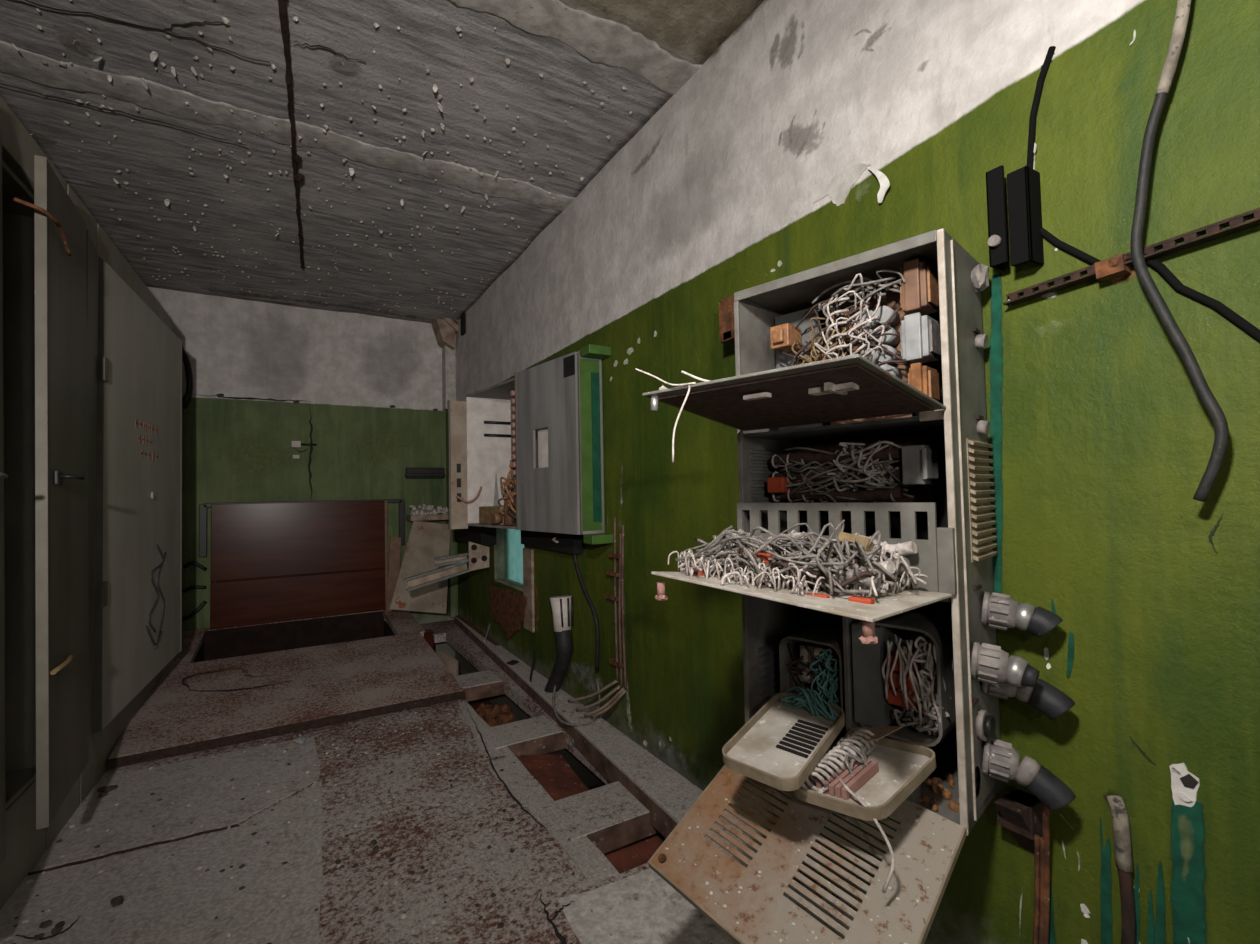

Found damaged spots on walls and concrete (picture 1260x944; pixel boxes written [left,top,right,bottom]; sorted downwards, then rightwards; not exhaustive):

damp [701,0,756,54]
crack [192,394,313,500]
flaking render [1169,763,1200,807]
crack [540,894,574,944]